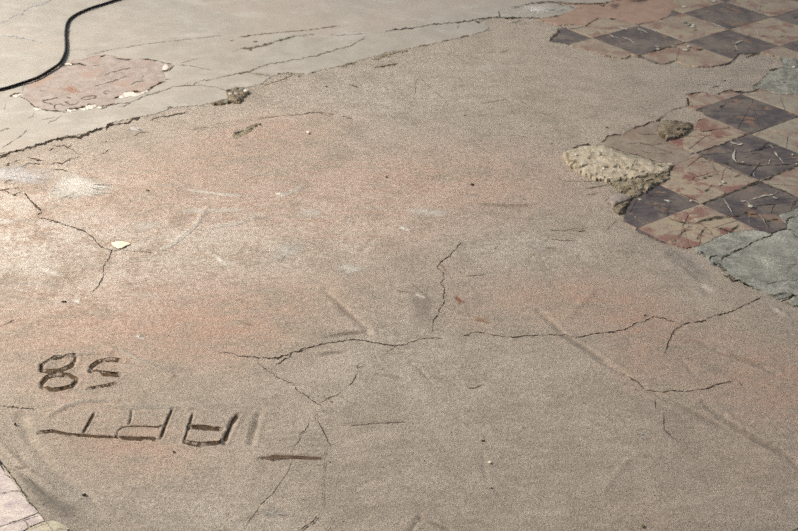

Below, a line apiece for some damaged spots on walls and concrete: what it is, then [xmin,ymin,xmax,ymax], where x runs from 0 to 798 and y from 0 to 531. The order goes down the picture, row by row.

spalling [549,0,798,68]
spalling [10,55,174,113]
hole [232,123,261,139]
crack [0,106,144,291]
spalling [623,89,798,249]
crack [464,206,798,354]
crack [220,243,476,530]
crack [624,374,744,440]
spalling [0,463,51,531]